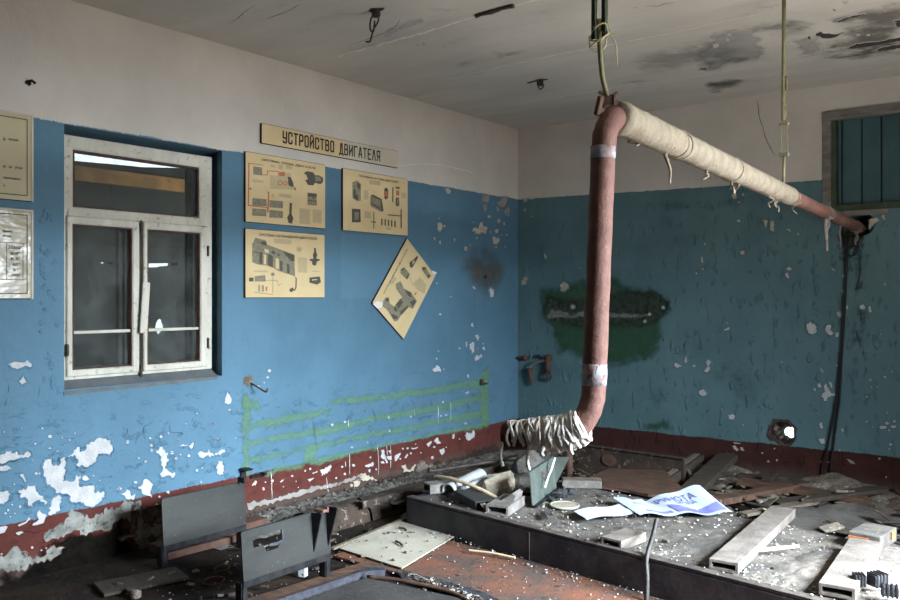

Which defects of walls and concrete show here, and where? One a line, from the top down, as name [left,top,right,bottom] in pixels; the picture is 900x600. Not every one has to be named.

damp [700,31,762,70]
damp [833,10,900,56]
peeling [453,192,510,252]
peeling [6,357,34,386]
peeling [813,367,836,403]
spalling [761,419,797,463]
peeling [246,422,475,511]
peeling [0,427,227,573]